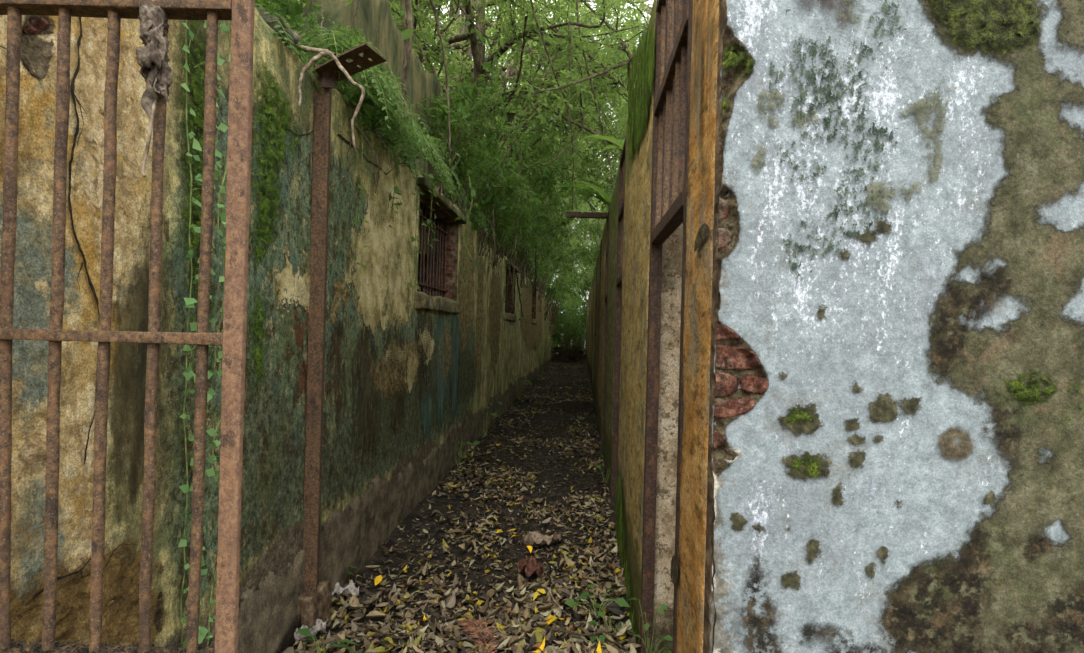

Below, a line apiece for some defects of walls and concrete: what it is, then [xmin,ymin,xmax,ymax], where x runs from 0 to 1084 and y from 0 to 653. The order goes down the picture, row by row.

spalling [21,15,58,79]
crack [68,17,99,314]
flaking render [82,17,140,255]
spalling [694,183,740,259]
crack [84,408,95,465]
leakage [330,309,460,467]
spalling [713,320,769,524]
peeling [883,0,1084,653]